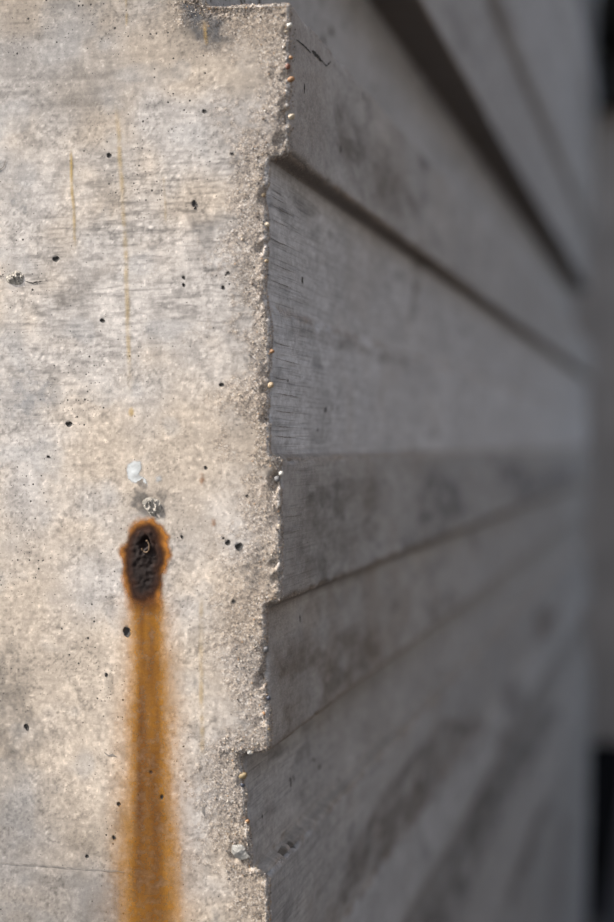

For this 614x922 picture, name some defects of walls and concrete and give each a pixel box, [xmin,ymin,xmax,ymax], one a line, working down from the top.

rust [119,518,178,922]